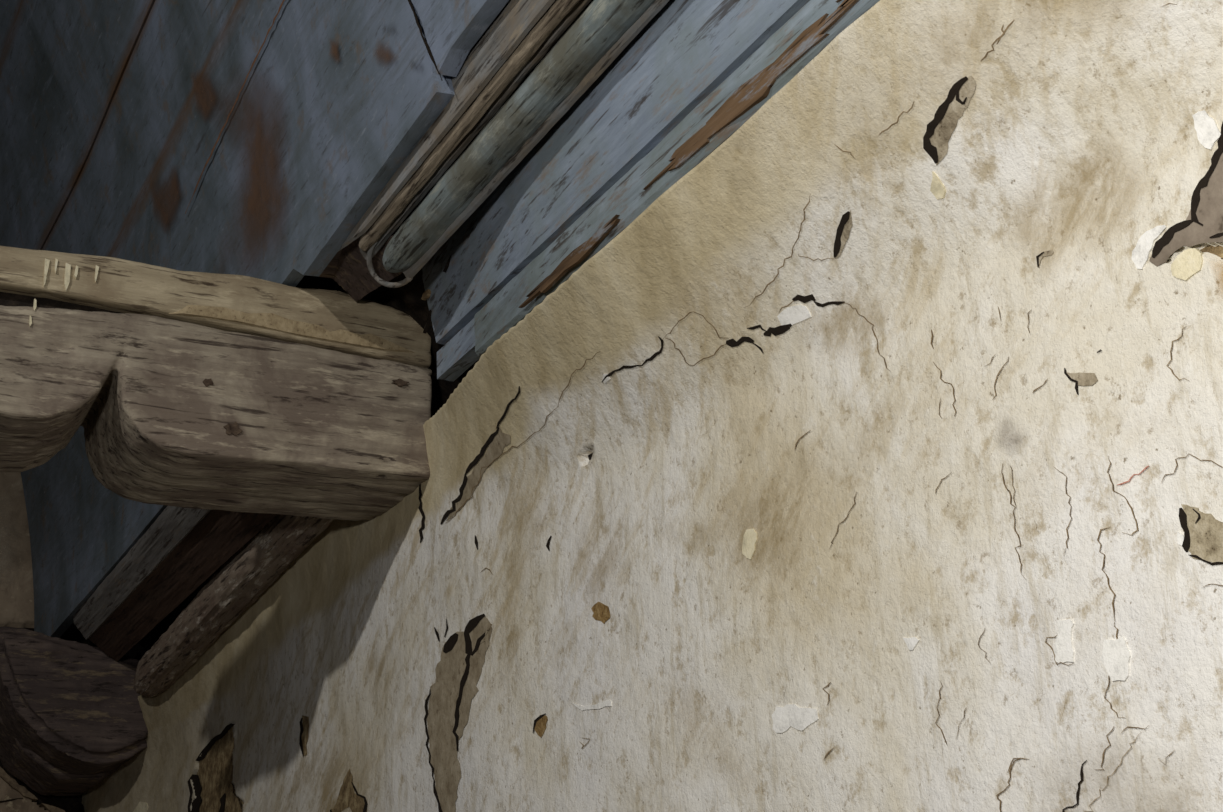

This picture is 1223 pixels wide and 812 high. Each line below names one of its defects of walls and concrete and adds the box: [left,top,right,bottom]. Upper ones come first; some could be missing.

peeling [643,0,858,190]
spalling [923,76,976,200]
spalling [1131,110,1223,281]
peeling [518,214,621,308]
crack [418,196,890,573]
spalling [1177,504,1223,565]
peeling [187,723,244,812]
spalling [330,769,367,812]
peeling [424,614,492,812]